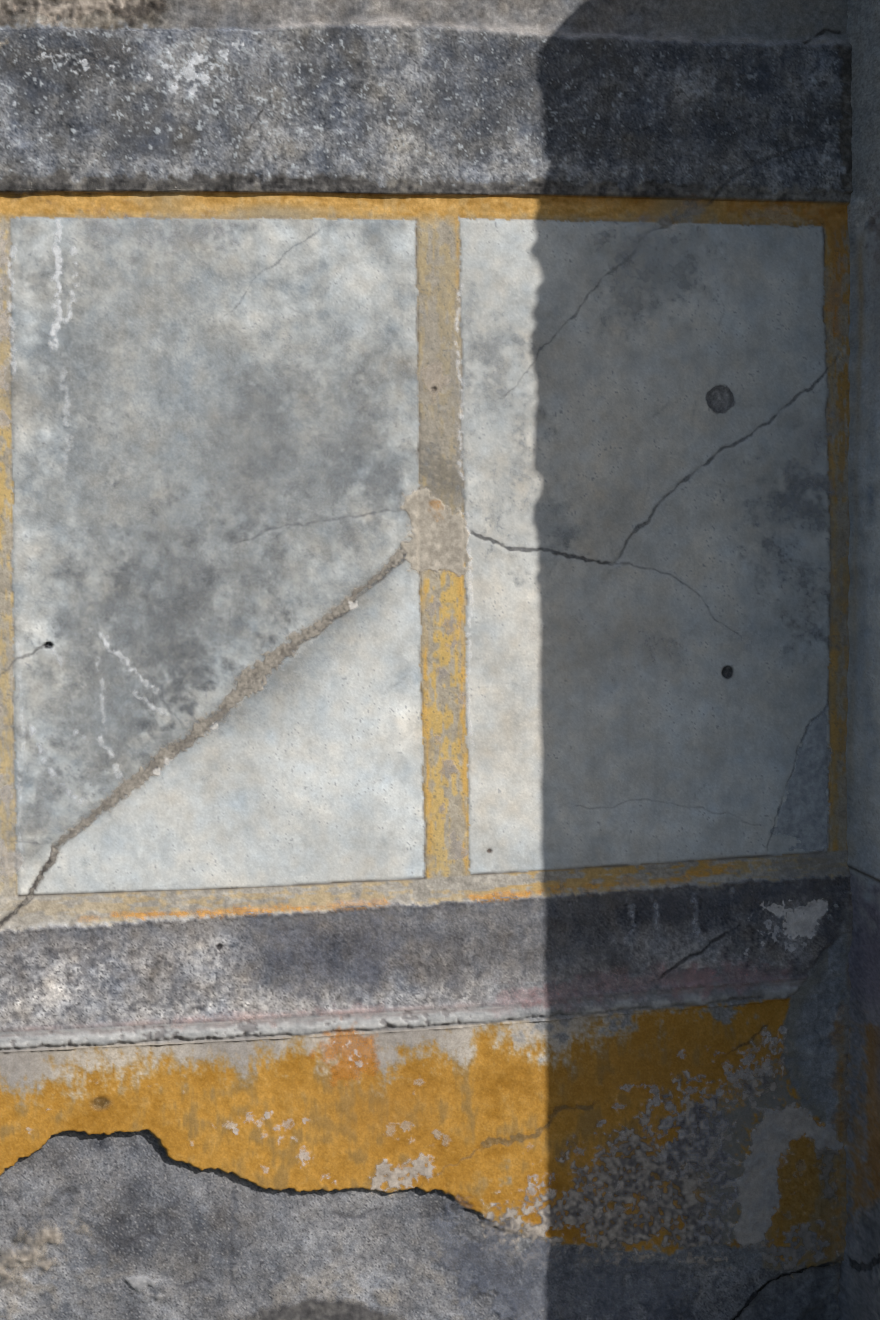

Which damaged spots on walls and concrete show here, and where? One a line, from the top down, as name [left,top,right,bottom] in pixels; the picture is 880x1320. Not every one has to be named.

crack [472,532,609,564]
crack [0,541,409,928]
crack [661,926,738,978]
spalling [744,900,828,956]
spalling [0,1026,842,1320]